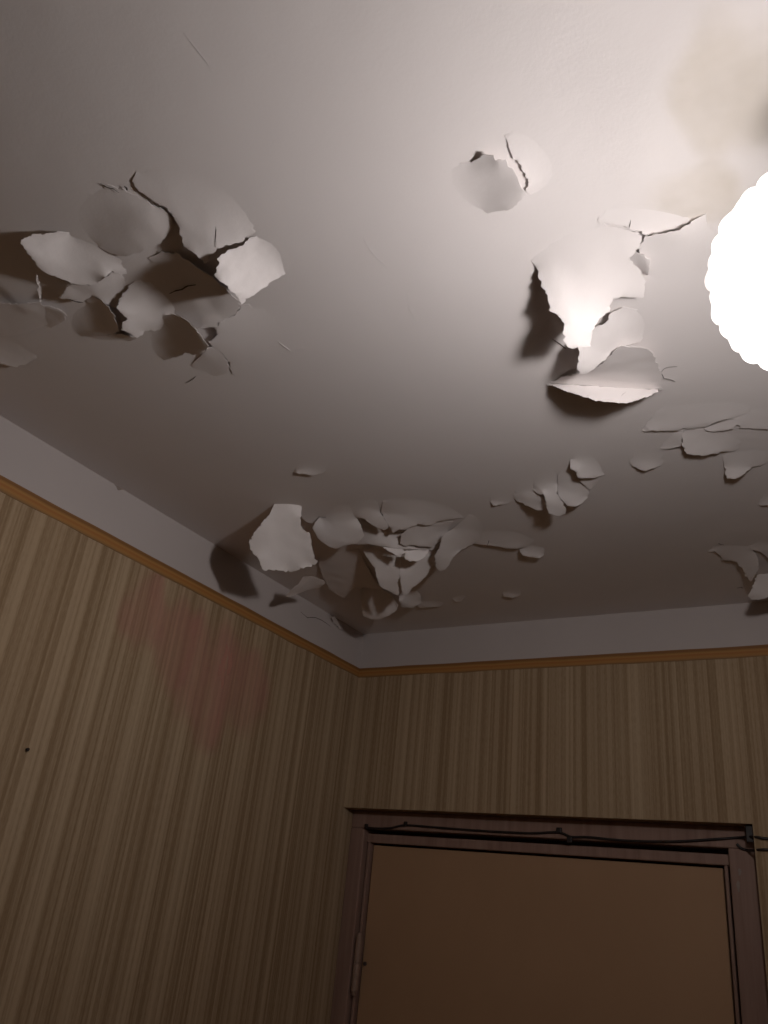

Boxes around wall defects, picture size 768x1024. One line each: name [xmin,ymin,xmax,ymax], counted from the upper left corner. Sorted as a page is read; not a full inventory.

peeling [0,167,285,383]
peeling [531,206,716,404]
peeling [490,449,604,516]
peeling [630,401,768,479]
peeling [249,497,544,620]
peeling [707,542,768,600]